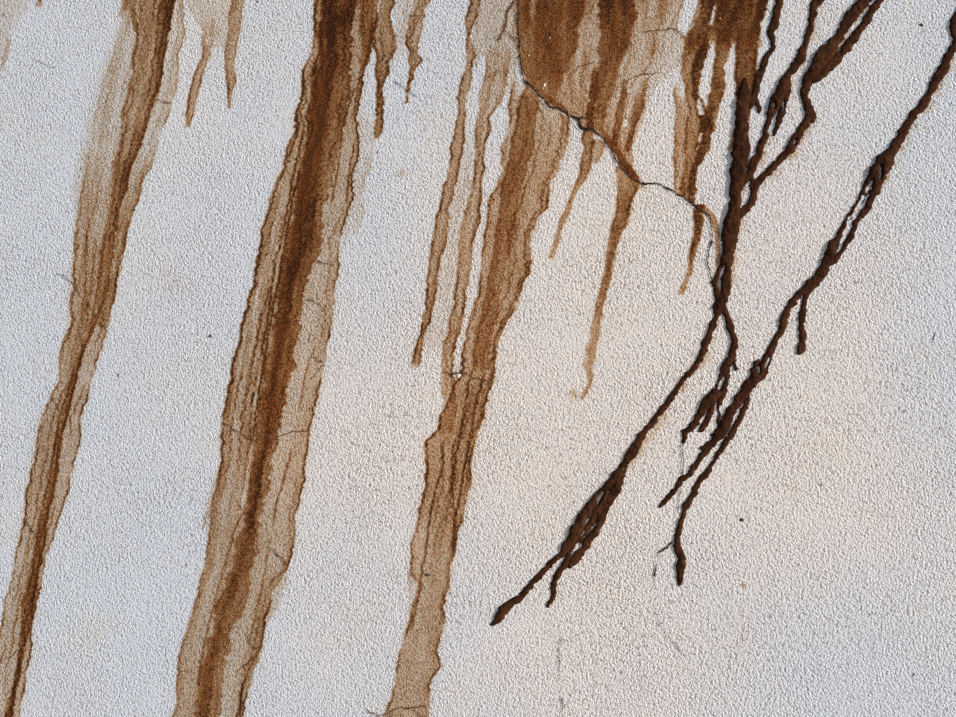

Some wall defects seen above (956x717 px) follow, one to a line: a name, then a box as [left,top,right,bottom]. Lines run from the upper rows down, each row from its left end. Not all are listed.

rust [0,0,176,717]
rust [198,0,422,717]
rust [406,0,554,635]
rust [500,0,645,310]
crack [497,0,718,280]
rust [674,0,768,264]